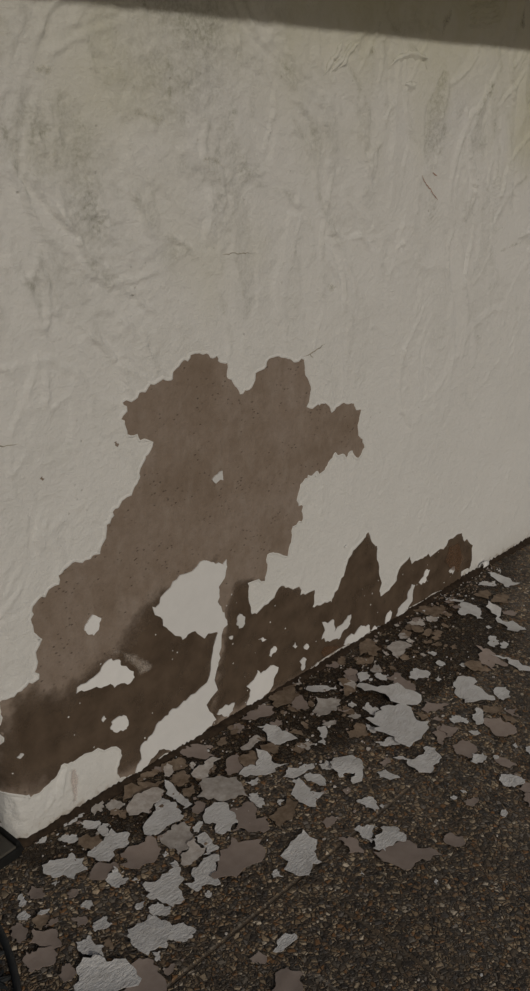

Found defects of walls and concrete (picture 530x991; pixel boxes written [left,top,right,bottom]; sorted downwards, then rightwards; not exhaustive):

peeling [0,351,530,800]